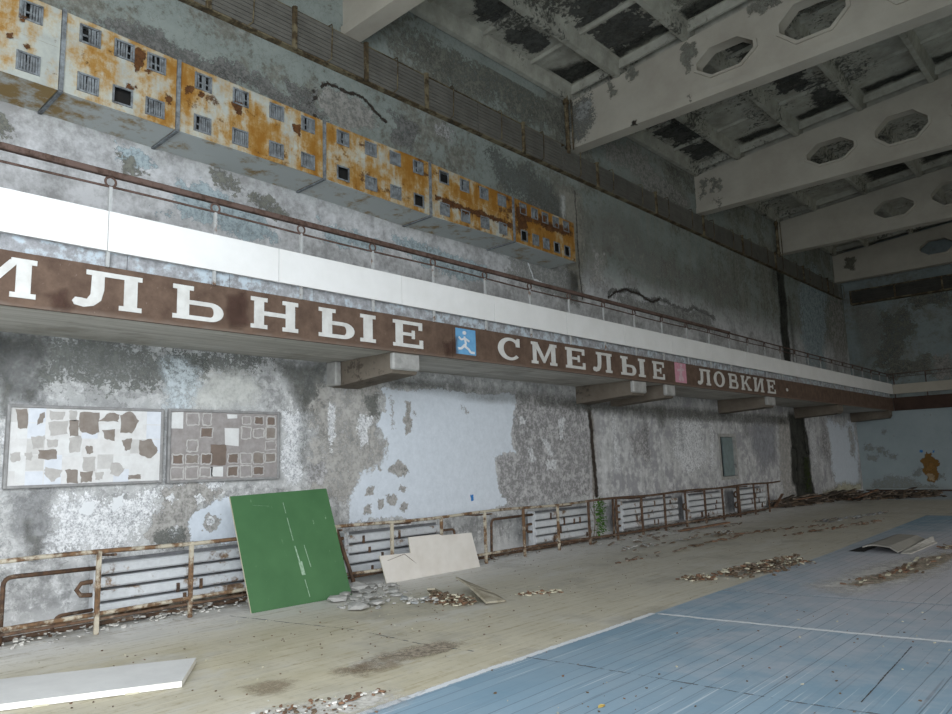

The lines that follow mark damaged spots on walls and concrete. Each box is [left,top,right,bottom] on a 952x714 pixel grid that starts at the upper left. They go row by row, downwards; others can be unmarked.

peeling [747,0,782,17]
peeling [798,0,838,15]
rust [132,47,151,74]
peeling [680,41,698,74]
peeling [725,42,751,62]
peeling [772,69,845,107]
rust [435,194,573,238]
peeling [356,394,415,451]
peeling [363,459,408,515]